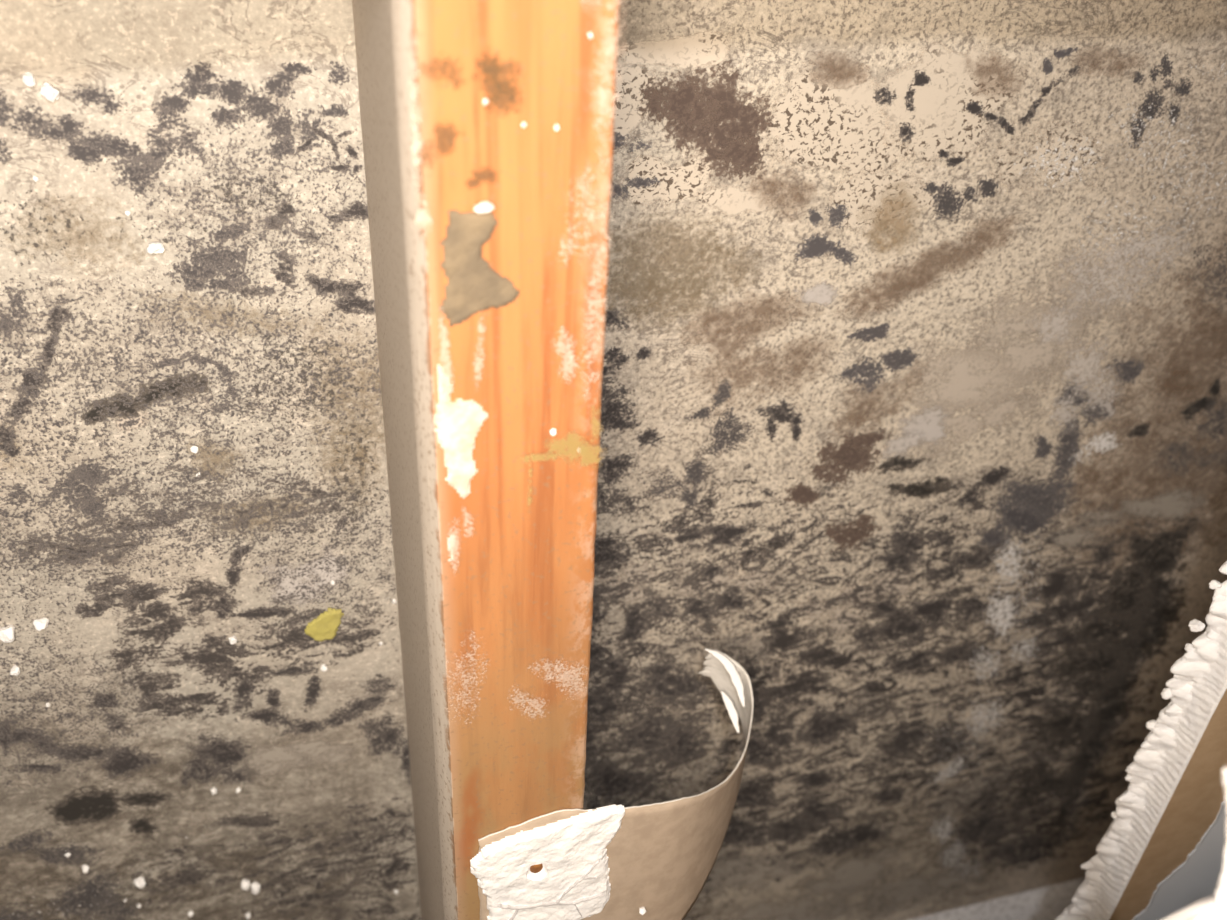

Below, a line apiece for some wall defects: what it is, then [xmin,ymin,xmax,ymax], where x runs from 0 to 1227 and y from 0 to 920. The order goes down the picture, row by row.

leakage [420,48,522,117]
leakage [420,121,463,168]
leakage [465,167,497,189]
flaking render [433,364,488,499]
leakage [0,60,422,920]
flaking render [447,535,456,562]
leakage [523,53,1227,920]
peeling [1044,488,1204,548]
peeling [1185,619,1205,652]
peeling [1110,689,1227,920]